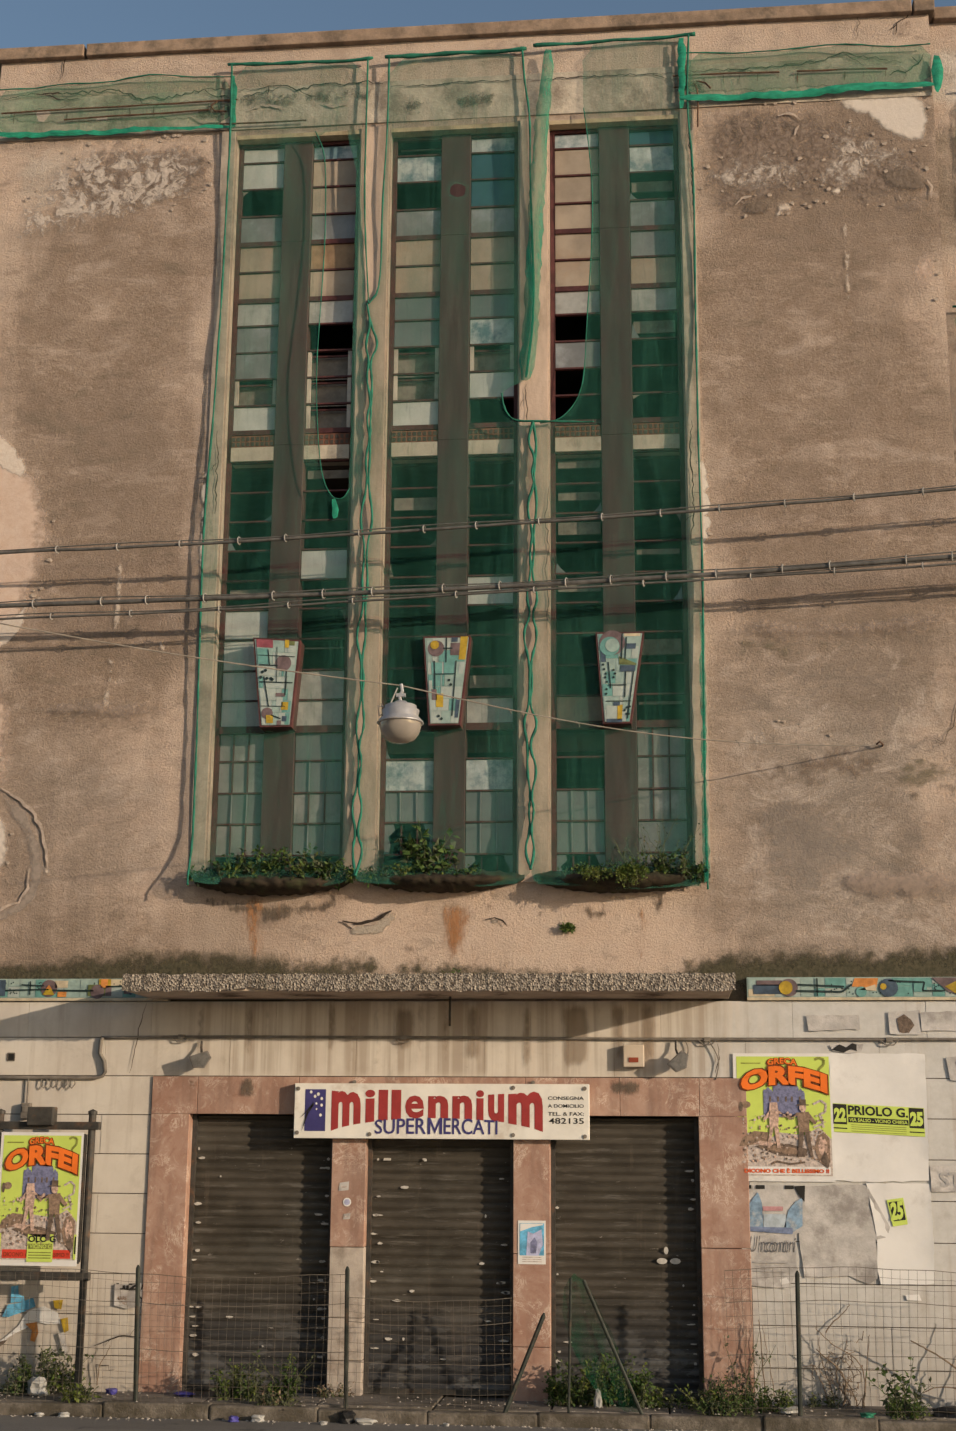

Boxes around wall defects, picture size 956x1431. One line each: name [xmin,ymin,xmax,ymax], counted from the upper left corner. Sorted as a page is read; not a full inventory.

peeling [1,89,371,234]
peeling [673,64,933,218]
leakage [0,787,49,920]
spalling [342,910,395,934]
corrosion [444,908,467,954]